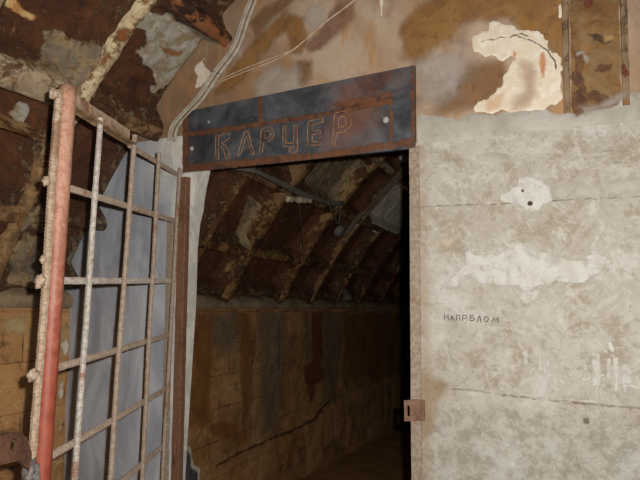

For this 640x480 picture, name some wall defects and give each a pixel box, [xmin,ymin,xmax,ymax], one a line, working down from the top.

flaking render [472,21,563,114]
crack [482,33,557,69]
rust [570,51,610,115]
peeling [500,176,640,212]
peeling [448,242,608,304]
crack [217,400,331,466]